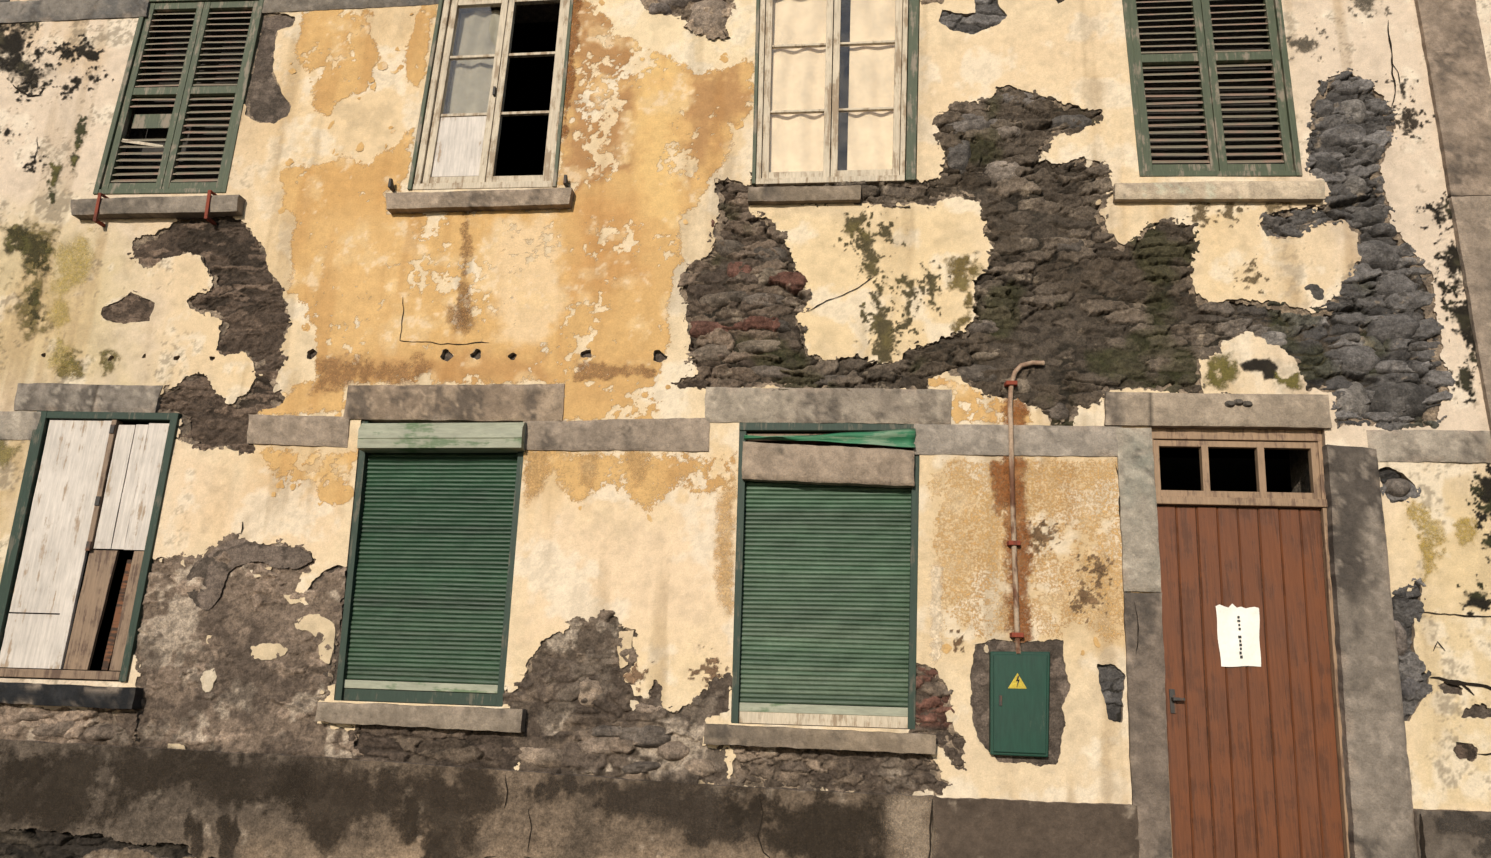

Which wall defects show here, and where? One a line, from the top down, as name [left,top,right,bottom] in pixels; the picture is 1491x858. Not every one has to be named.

mould [0,22,114,102]
flaking render [101,290,155,324]
flaking render [127,0,1456,506]
corrosion [1001,398,1029,425]
peeling [522,450,738,522]
corrosion [990,456,1033,643]
peeling [927,456,1135,722]
flaking render [0,533,980,796]
flaking render [1392,578,1491,721]
damp [0,738,503,858]
crack [484,776,532,858]